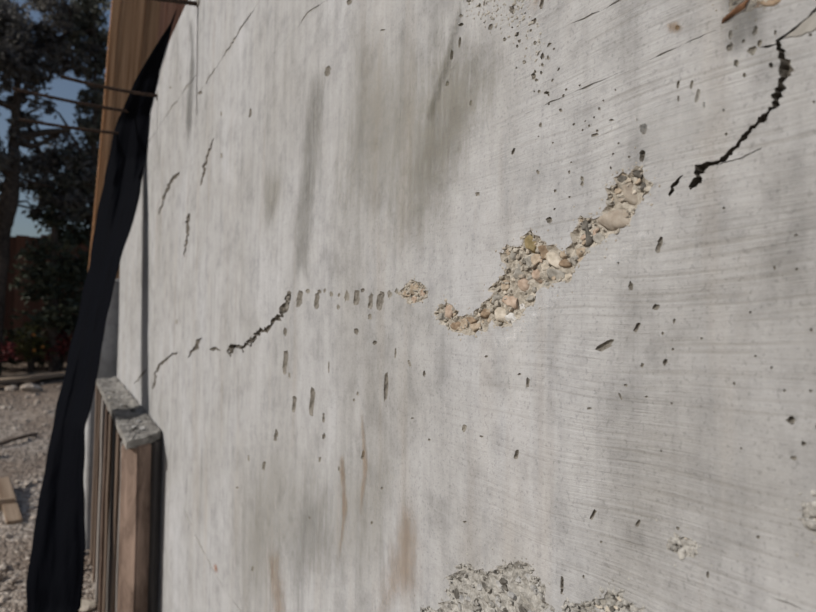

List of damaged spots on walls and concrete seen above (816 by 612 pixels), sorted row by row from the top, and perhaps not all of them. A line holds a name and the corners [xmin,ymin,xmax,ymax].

peeling [466,0,555,105]
crack [668,8,816,196]
crack [134,294,291,389]
spalling [789,490,816,545]